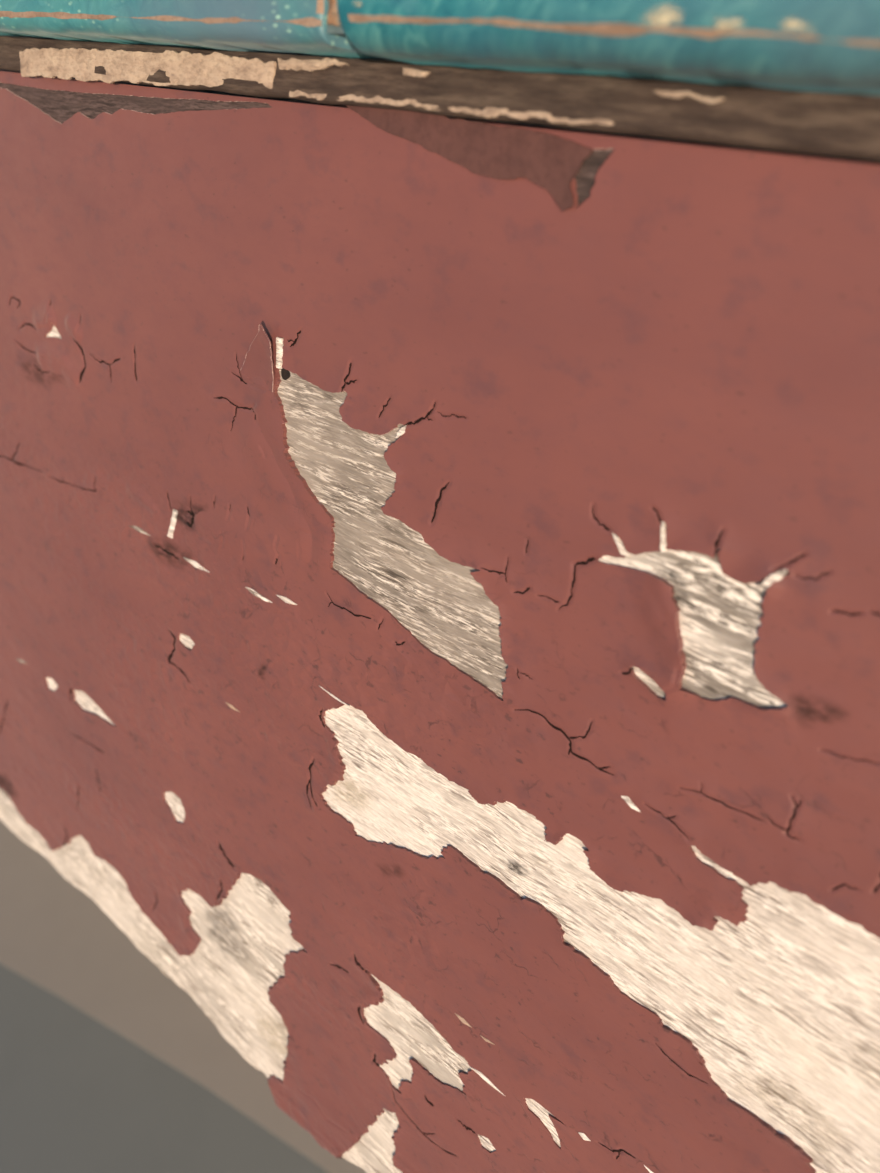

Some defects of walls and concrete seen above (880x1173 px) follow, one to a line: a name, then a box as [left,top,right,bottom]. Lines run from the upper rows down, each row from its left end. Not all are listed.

peeling [0,83,278,124]
peeling [337,104,614,211]
crack [217,355,256,432]
crack [341,363,357,392]
crack [379,398,467,426]
peeling [240,323,508,699]
crack [431,482,449,523]
crack [482,542,596,610]
peeling [599,522,790,718]
crack [521,709,614,776]
peeling [0,788,306,1081]
peeling [319,686,880,1173]